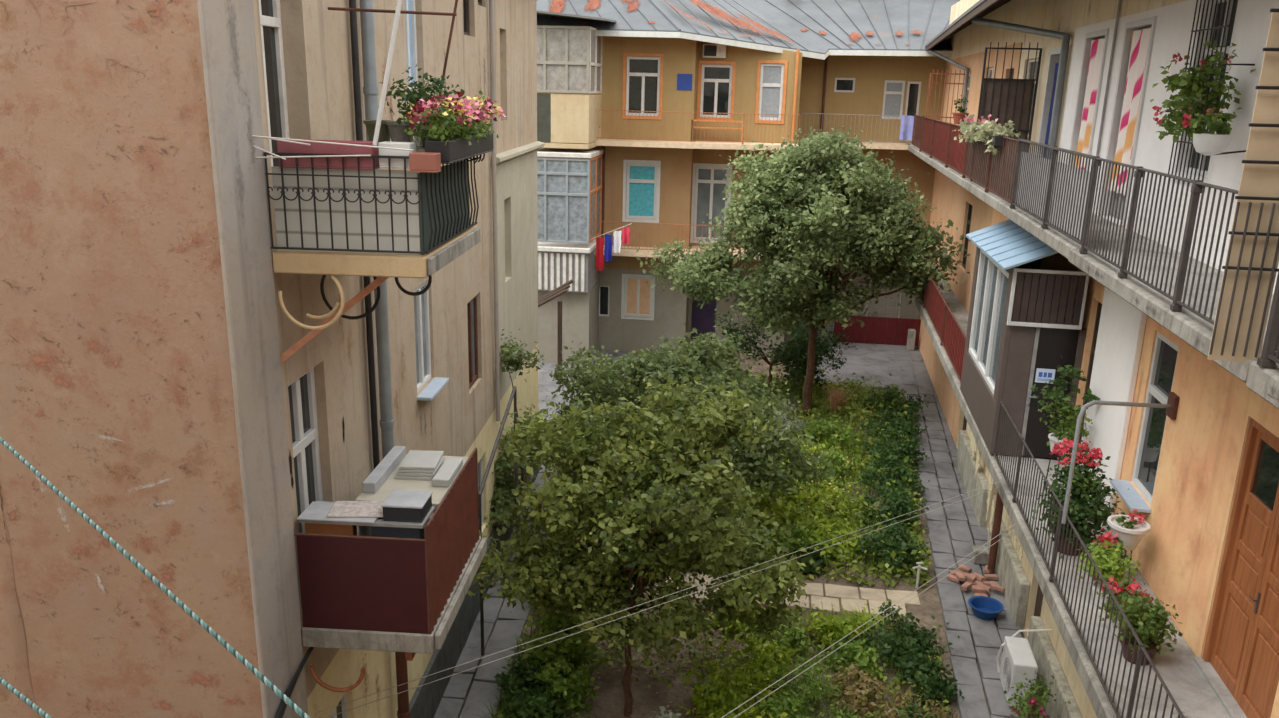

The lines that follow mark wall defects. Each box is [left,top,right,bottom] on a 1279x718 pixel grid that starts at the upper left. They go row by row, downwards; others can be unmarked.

corrosion [549,0,565,18]
corrosion [580,0,600,25]